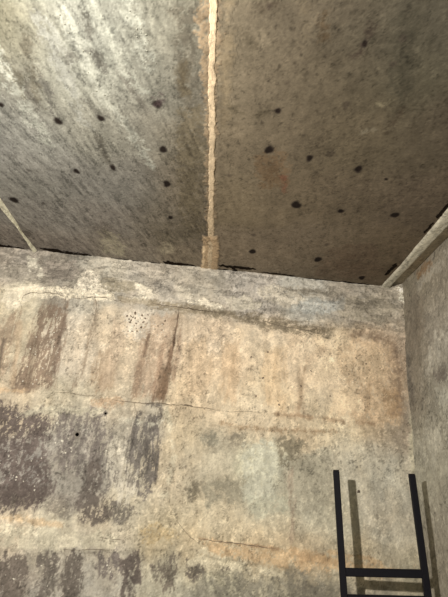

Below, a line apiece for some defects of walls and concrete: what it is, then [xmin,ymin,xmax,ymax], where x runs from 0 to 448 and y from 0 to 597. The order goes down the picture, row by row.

water stain [0,299,165,528]
crack [116,400,260,417]